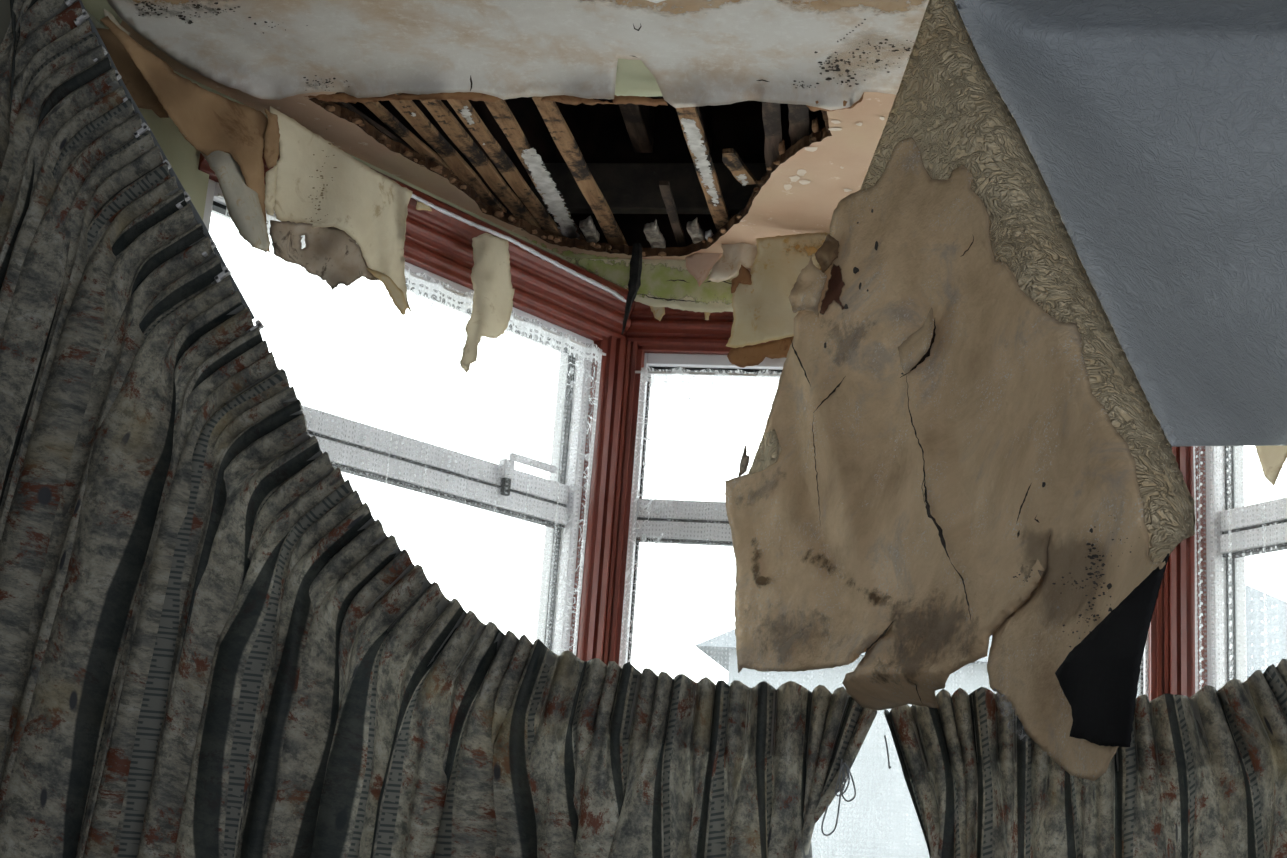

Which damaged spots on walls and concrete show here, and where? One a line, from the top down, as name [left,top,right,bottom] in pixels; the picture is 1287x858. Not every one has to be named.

water stain [780,0,924,88]
peeling [702,161,780,282]
crack [906,375,971,620]
water stain [1052,526,1140,648]